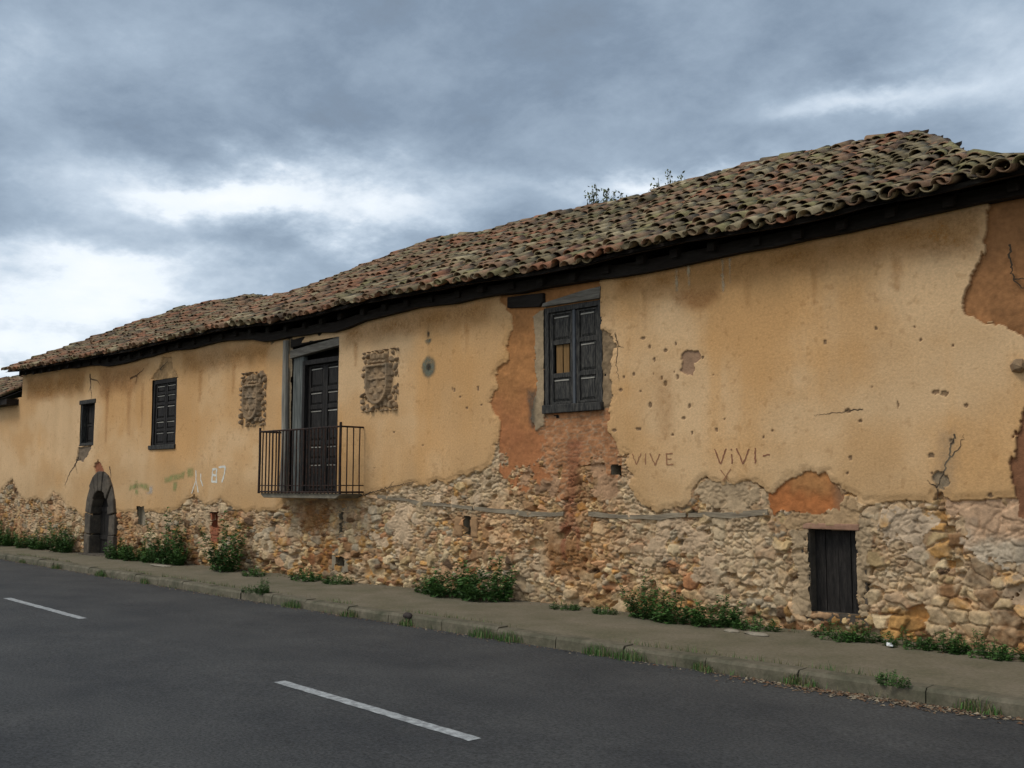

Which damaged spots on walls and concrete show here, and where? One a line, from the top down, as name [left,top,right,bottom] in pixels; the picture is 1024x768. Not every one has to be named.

peeling [965,198,1024,335]
crack [1007,244,1024,289]
spalling [78,446,104,472]
spalling [112,281,1024,654]
crack [929,434,964,499]